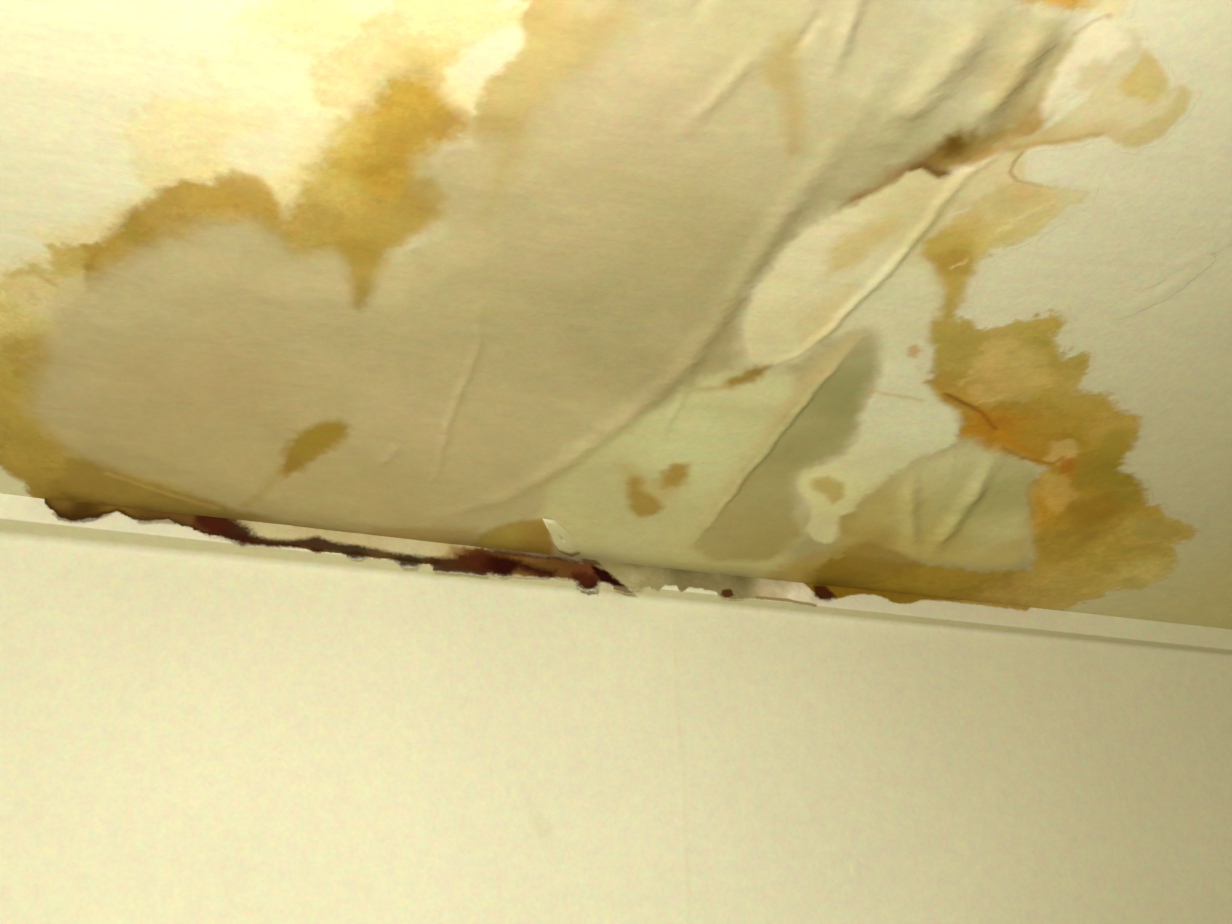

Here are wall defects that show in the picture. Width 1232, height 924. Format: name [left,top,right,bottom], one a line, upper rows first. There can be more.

water stain [0,0,1232,629]
peeling [543,519,581,556]
peeling [596,560,818,607]